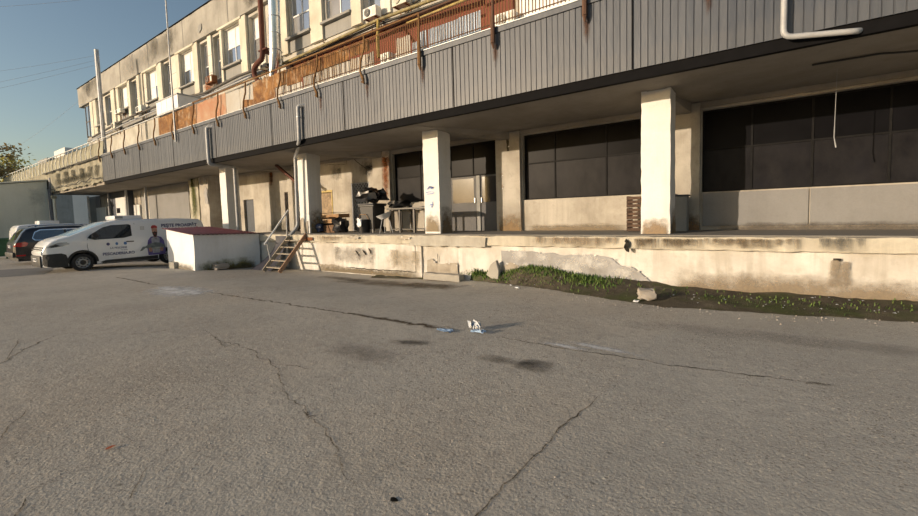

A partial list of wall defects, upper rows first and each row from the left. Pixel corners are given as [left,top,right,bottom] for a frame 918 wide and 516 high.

damp [830,260,850,284]
crack [219,293,453,329]
crack [475,396,598,516]